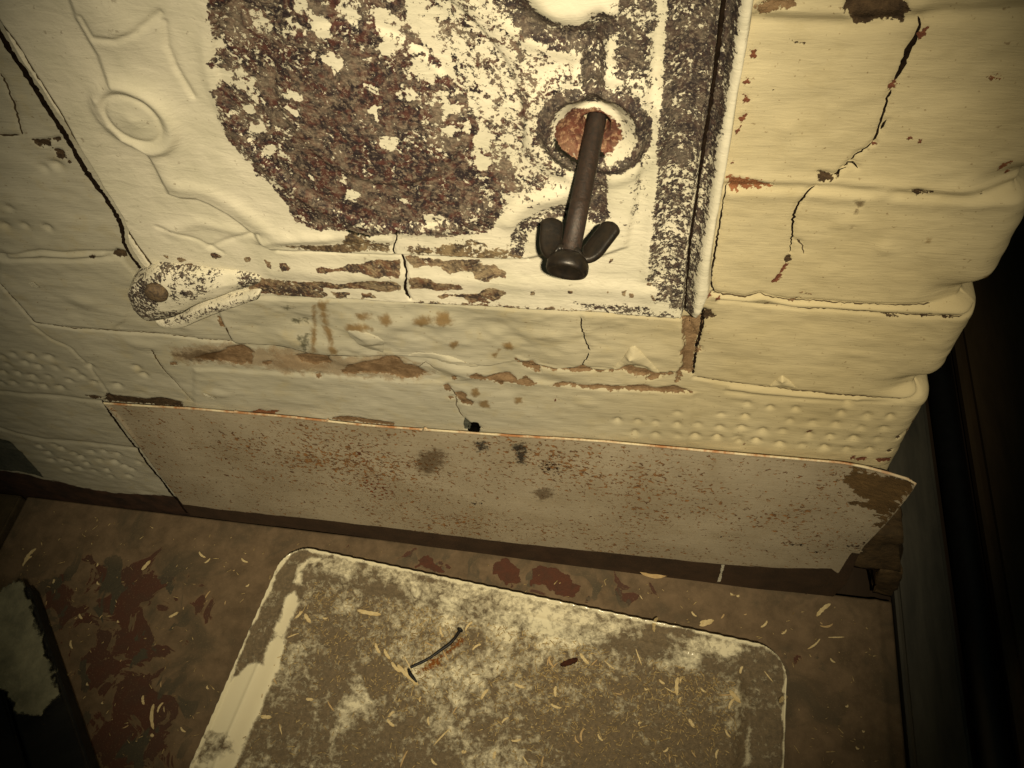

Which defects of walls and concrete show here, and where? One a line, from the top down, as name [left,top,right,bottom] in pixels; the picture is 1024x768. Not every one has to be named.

rust [555,107,623,160]
crack [790,16,921,253]
peeling [128,0,797,405]
crack [392,230,410,298]
crack [580,318,590,365]